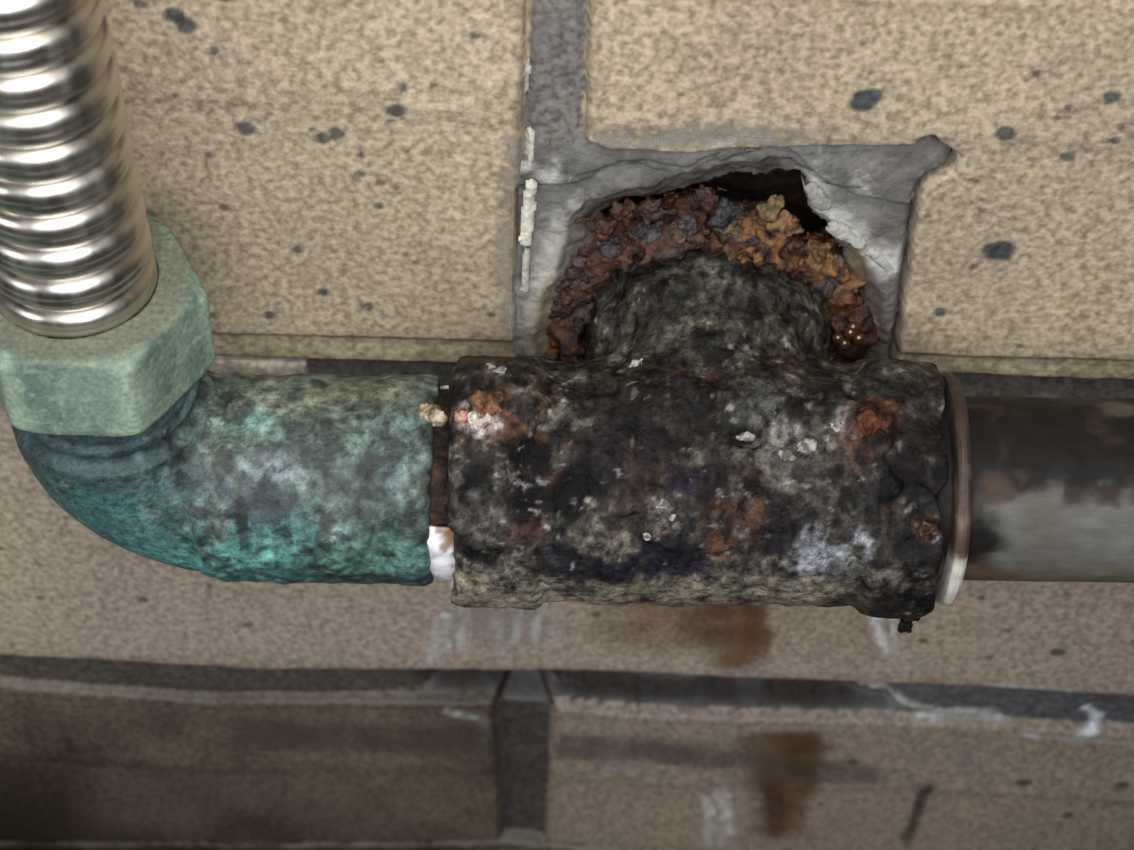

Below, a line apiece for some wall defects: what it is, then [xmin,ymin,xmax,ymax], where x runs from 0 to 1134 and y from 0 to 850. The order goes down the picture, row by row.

peeling [523,58,531,95]
spalling [514,126,951,359]
leakage [430,603,558,659]
leakage [869,617,899,654]
leakage [859,681,1004,723]
leakage [997,683,1131,745]